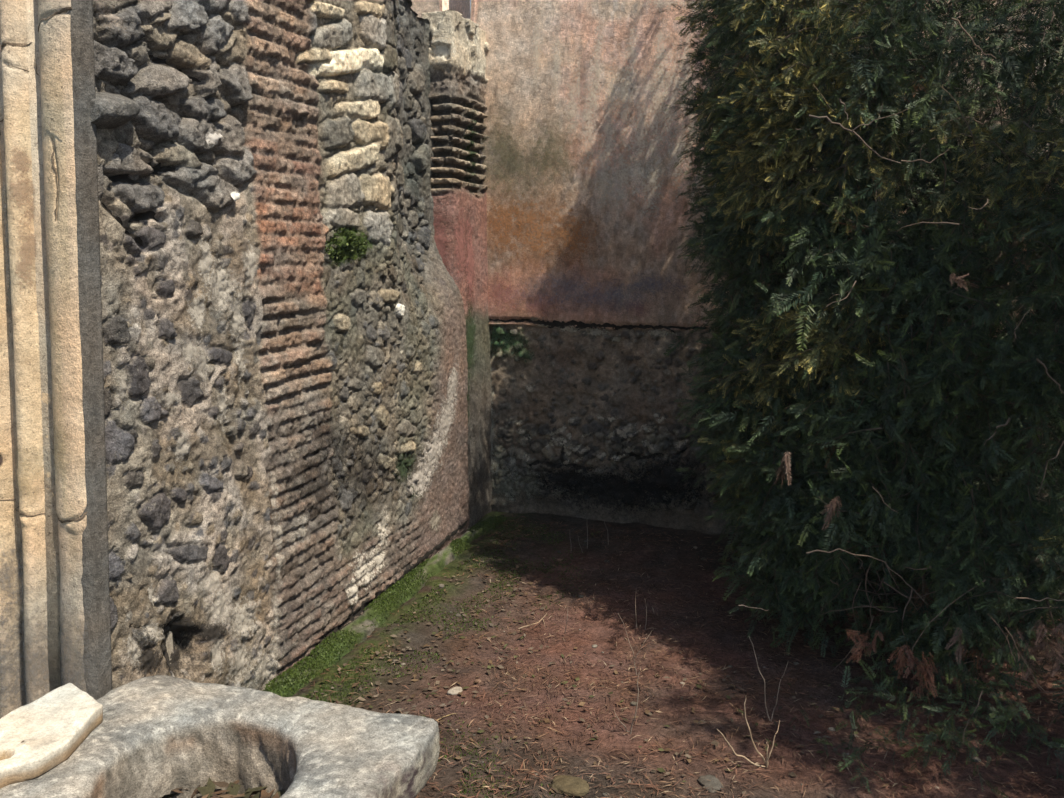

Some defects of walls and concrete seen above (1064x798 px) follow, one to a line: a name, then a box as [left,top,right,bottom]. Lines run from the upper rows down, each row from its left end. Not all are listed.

crack [49,125,61,221]
crack [489,319,707,333]
peeling [513,413,687,465]
water stain [345,505,391,605]